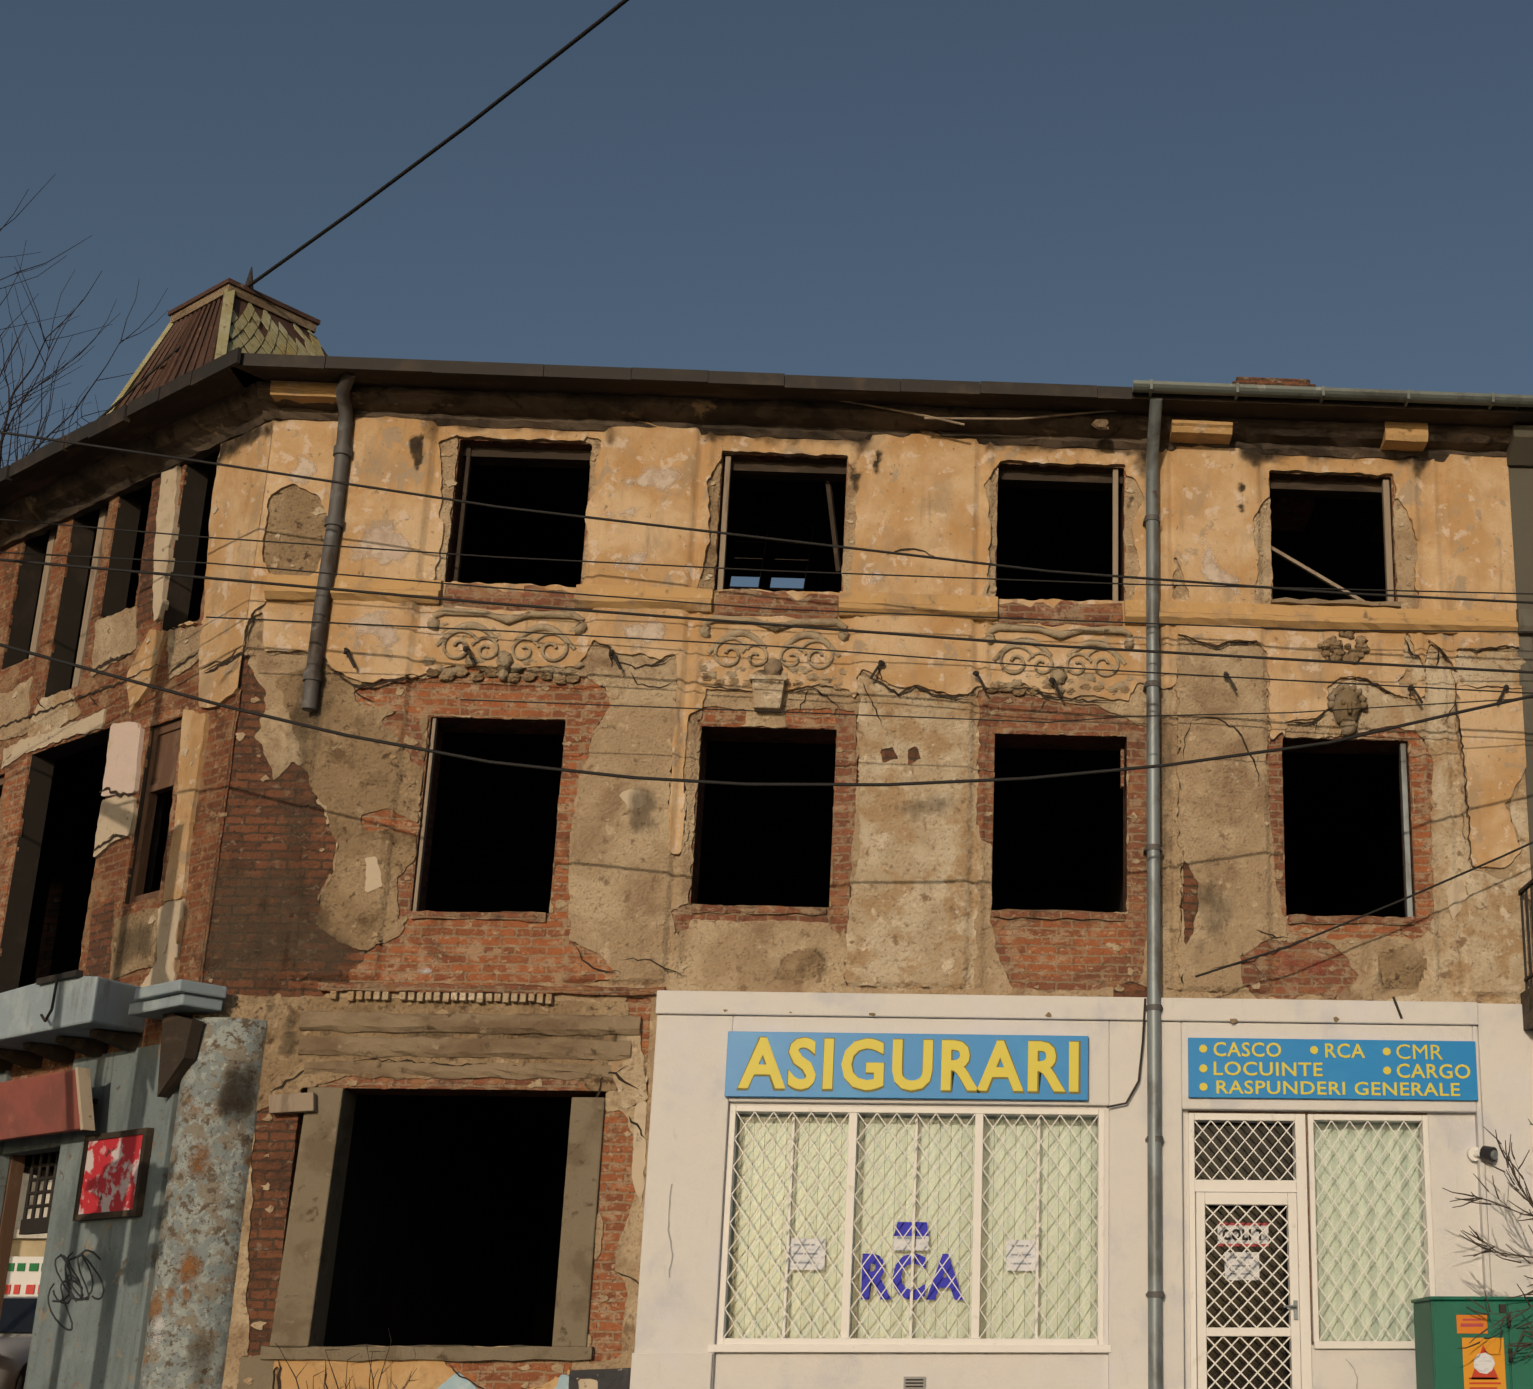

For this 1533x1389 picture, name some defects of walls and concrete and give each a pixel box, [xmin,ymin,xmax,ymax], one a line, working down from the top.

flaking render [136,476,161,655]
peeling [352,610,397,646]
flaking render [0,759,28,956]
flaking render [86,899,114,979]
flaking render [141,709,184,729]
flaking render [165,738,193,876]
flaking render [198,622,1533,1022]
flaking render [319,1076,589,1091]
flaking render [236,1107,299,1389]
flaking render [438,997,651,1389]